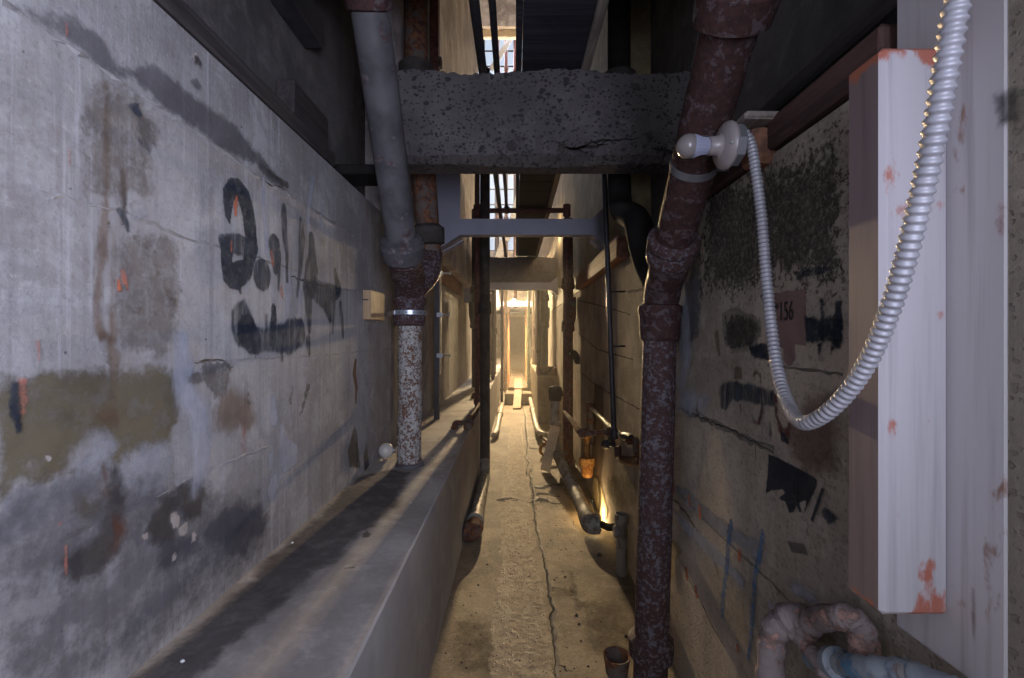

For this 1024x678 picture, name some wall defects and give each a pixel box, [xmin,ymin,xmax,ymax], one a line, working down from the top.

water stain [43,19,322,361]
crack [558,138,673,154]
water stain [0,337,265,678]
water stain [137,428,409,678]
crack [497,407,576,678]